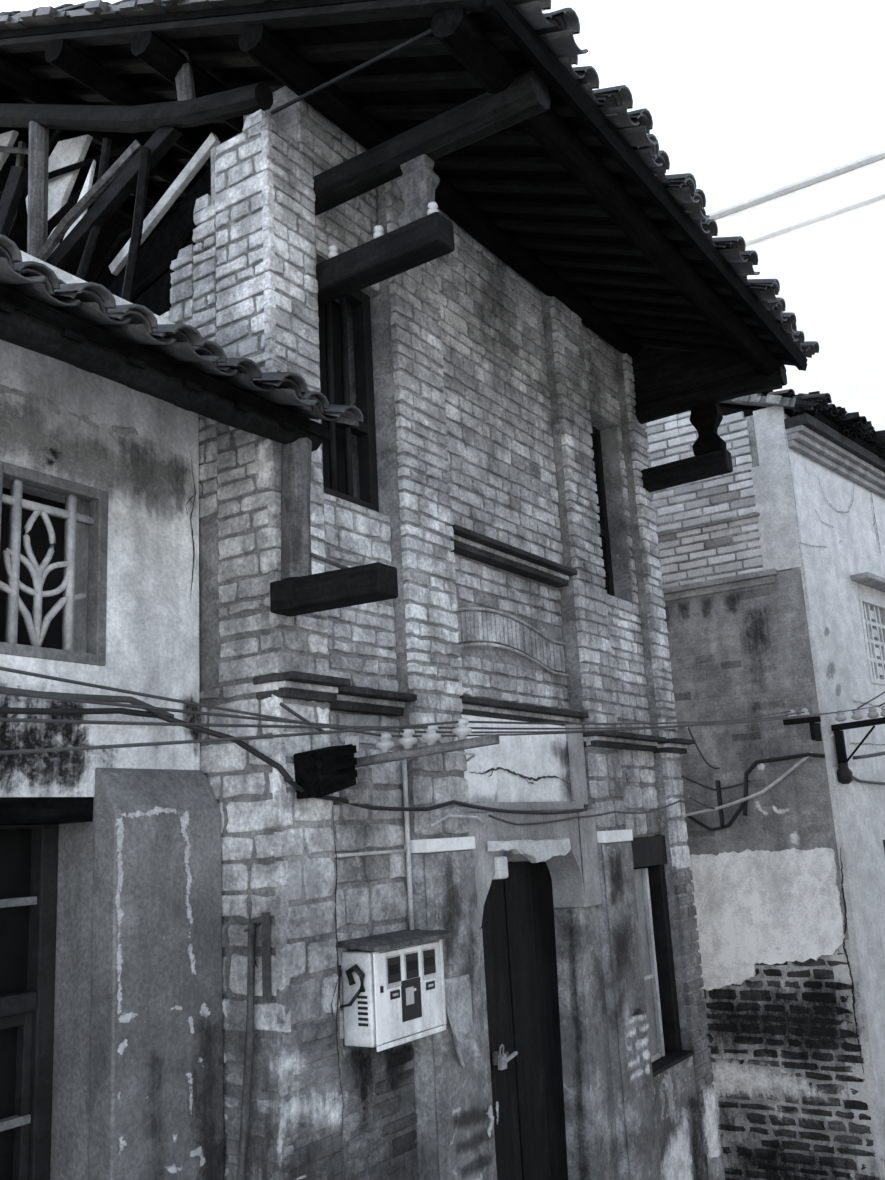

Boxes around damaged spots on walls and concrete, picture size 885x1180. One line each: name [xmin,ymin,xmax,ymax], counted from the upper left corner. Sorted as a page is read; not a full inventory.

damp [0,399,196,513]
damp [725,593,738,613]
damp [747,611,767,674]
damp [0,696,88,794]
crack [470,767,569,784]
damp [611,853,623,902]
peeling [115,805,196,1023]
damp [615,924,633,979]
peeling [170,999,227,1034]
damp [570,920,588,1180]
peeling [186,1058,204,1114]
peeling [165,1146,206,1173]